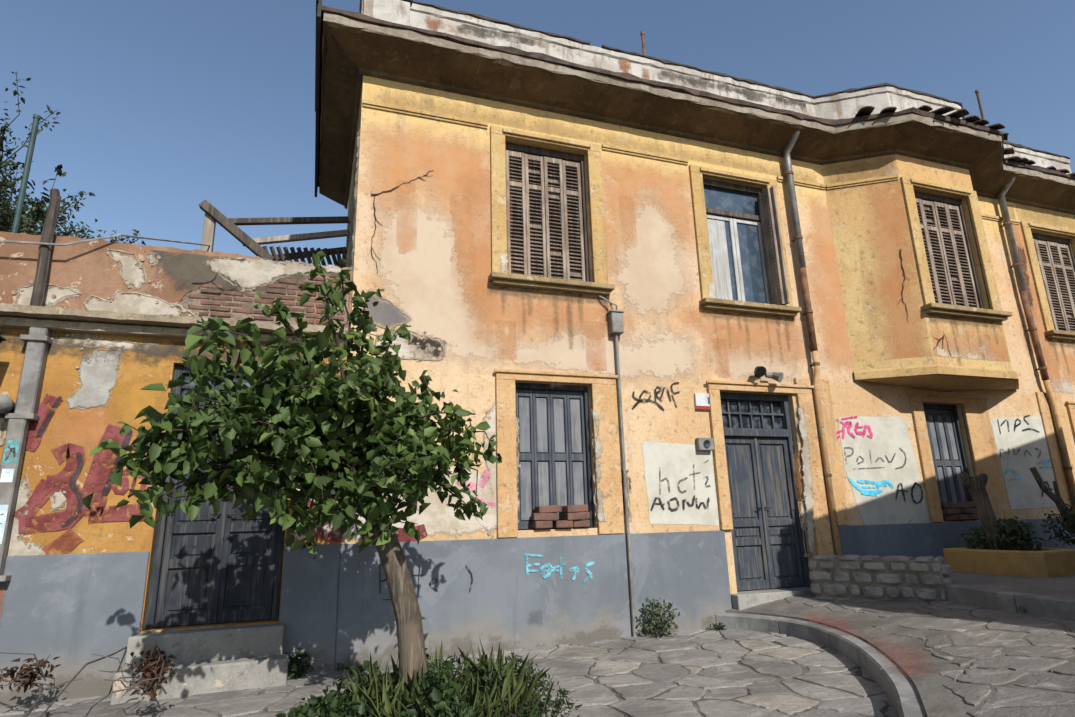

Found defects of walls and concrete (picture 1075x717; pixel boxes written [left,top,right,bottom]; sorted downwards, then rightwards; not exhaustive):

crack [349,170,434,274]
flaking render [176,267,351,327]
flaking render [365,288,446,362]
crack [898,249,910,322]